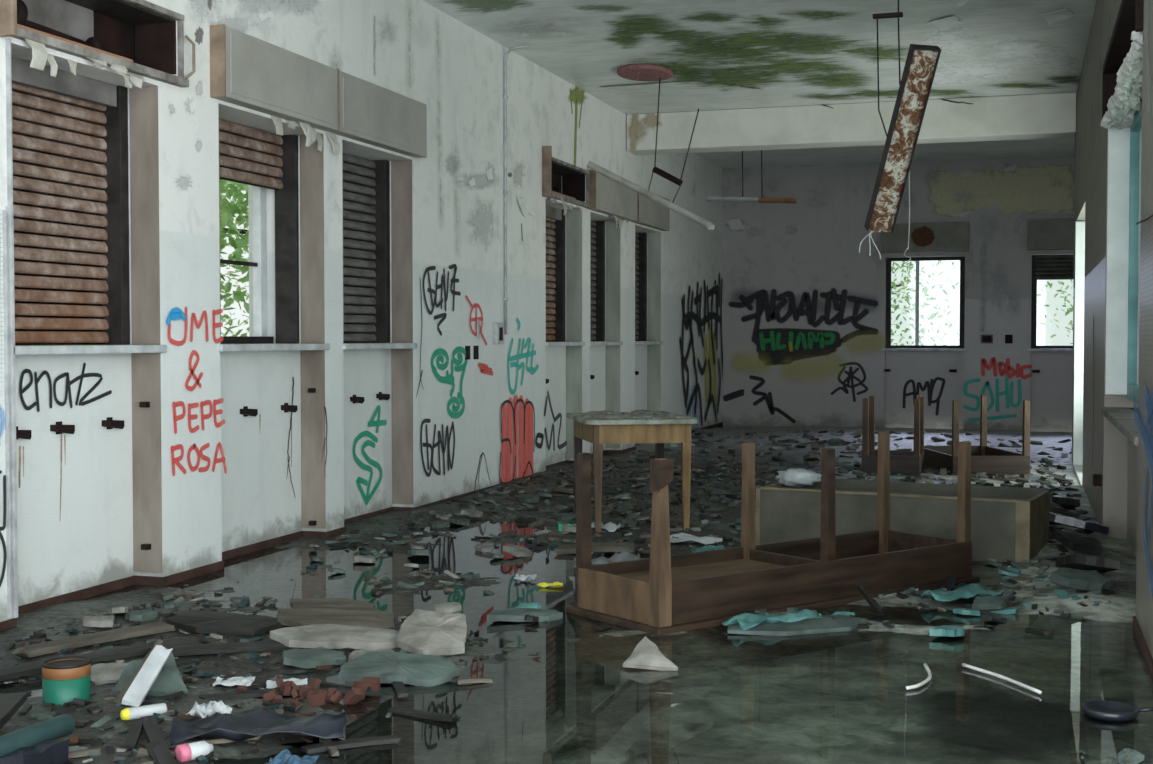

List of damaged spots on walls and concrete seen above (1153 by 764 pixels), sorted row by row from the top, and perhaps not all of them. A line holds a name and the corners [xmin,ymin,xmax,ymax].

damp [444,0,528,13]
damp [576,6,909,100]
damp [992,76,1079,88]
spalling [1100,31,1143,130]
damp [930,90,975,98]